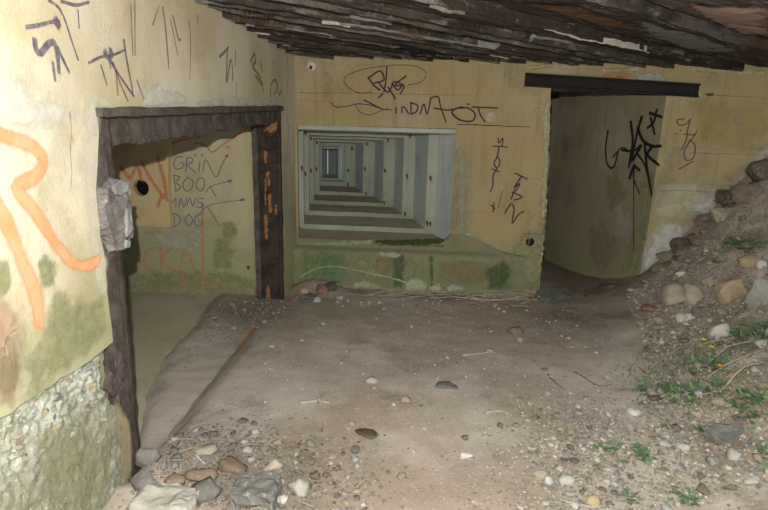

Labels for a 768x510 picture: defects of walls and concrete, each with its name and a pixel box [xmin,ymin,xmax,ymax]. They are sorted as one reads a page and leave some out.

rust [264,151,277,239]
water stain [299,256,495,291]
water stain [0,305,22,403]
spalling [0,351,126,510]